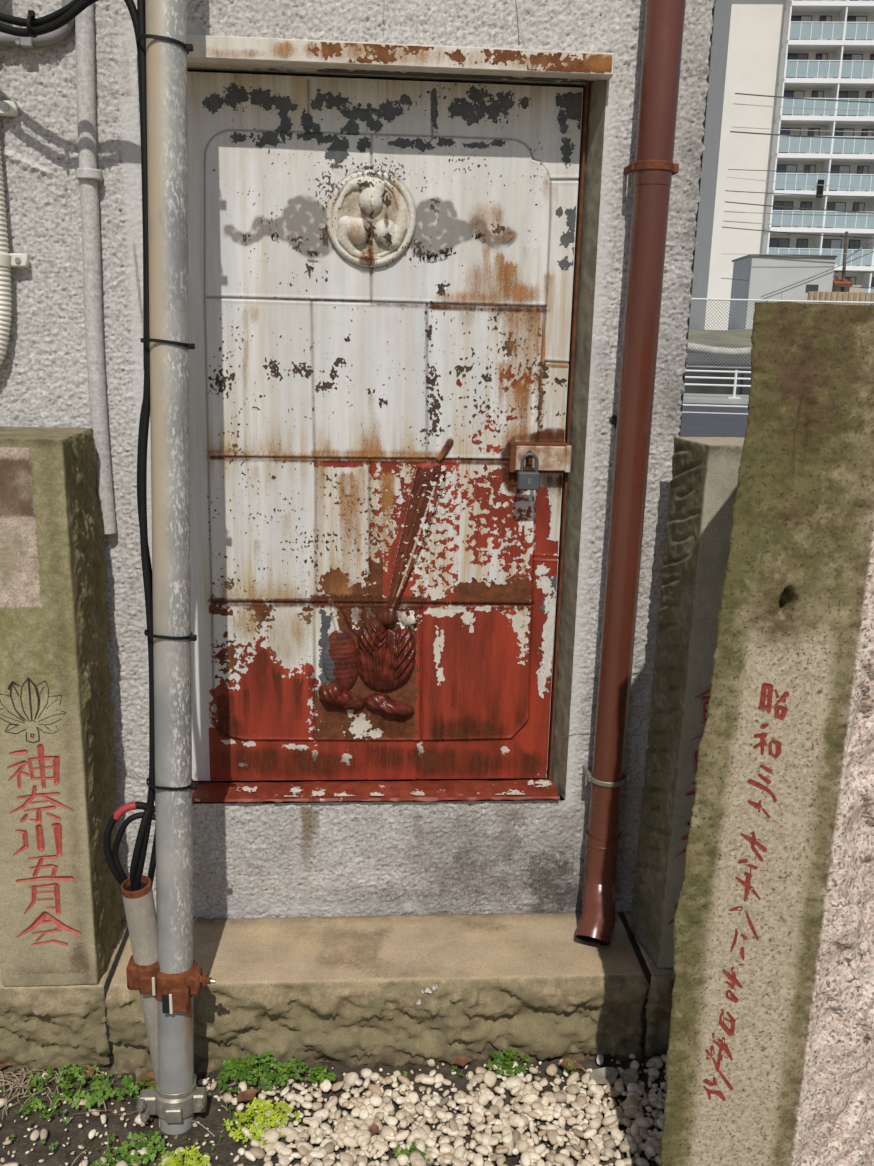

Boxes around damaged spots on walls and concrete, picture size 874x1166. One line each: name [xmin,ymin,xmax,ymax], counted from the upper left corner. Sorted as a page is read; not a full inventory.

corrosion [278,42,292,57]
corrosion [543,54,612,73]
peeling [202,42,611,308]
corrosion [430,253,568,367]
corrosion [459,366,565,495]
corrosion [210,436,444,533]
peeling [207,280,567,797]
corrosion [210,581,438,631]
corrosion [217,692,245,737]
corrosion [294,750,340,775]
corrosion [385,721,502,773]